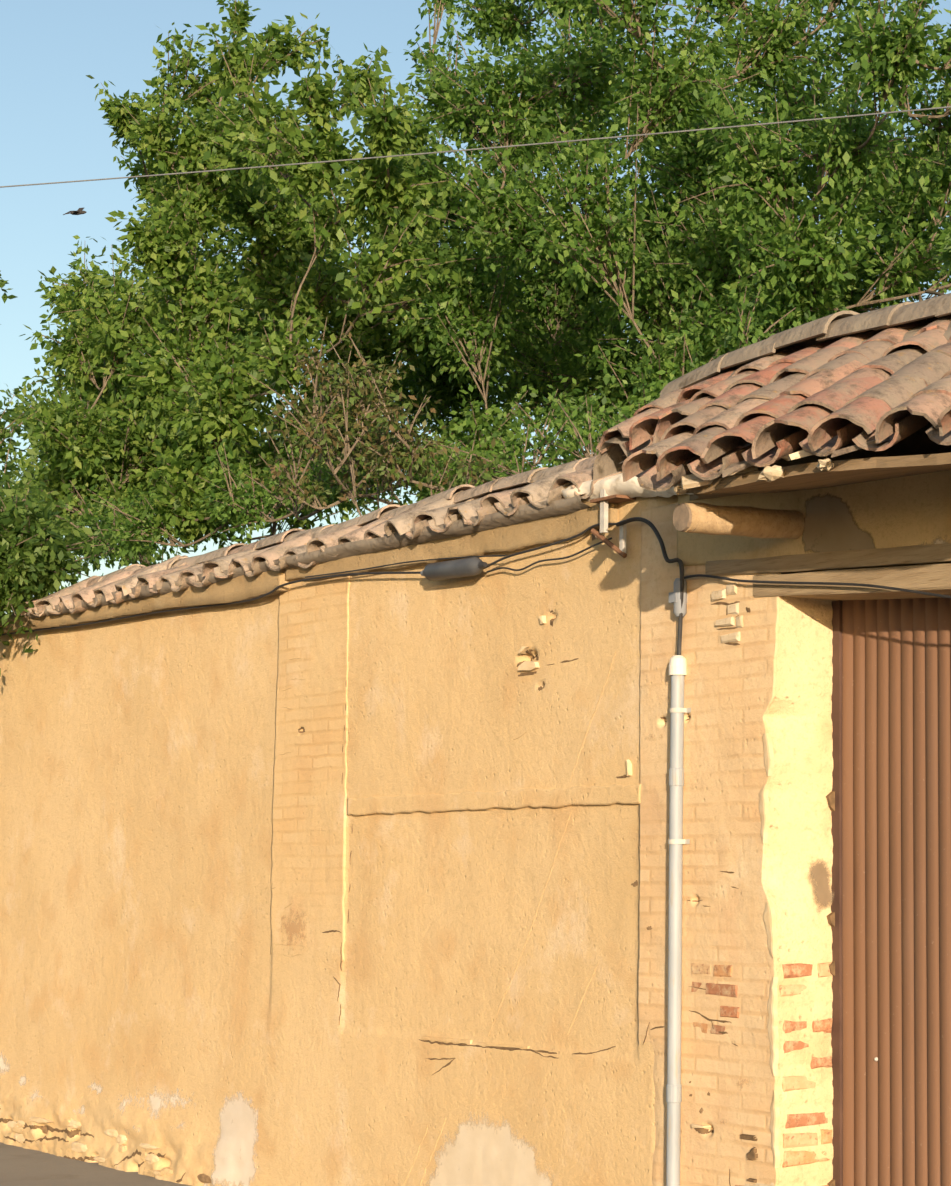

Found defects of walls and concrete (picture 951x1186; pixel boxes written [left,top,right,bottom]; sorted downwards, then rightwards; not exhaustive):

flaking render [711,582,743,643]
spalling [517,646,545,691]
spalling [826,791,835,811]
crack [419,813,664,1074]
flaking render [763,903,835,1168]
peeling [119,1089,190,1118]
spalling [7,1106,105,1163]
spalling [104,1128,173,1177]
damp [204,1093,258,1186]
flaking render [740,1134,758,1161]
spalling [197,1174,212,1183]
flaking render [735,1178,774,1186]